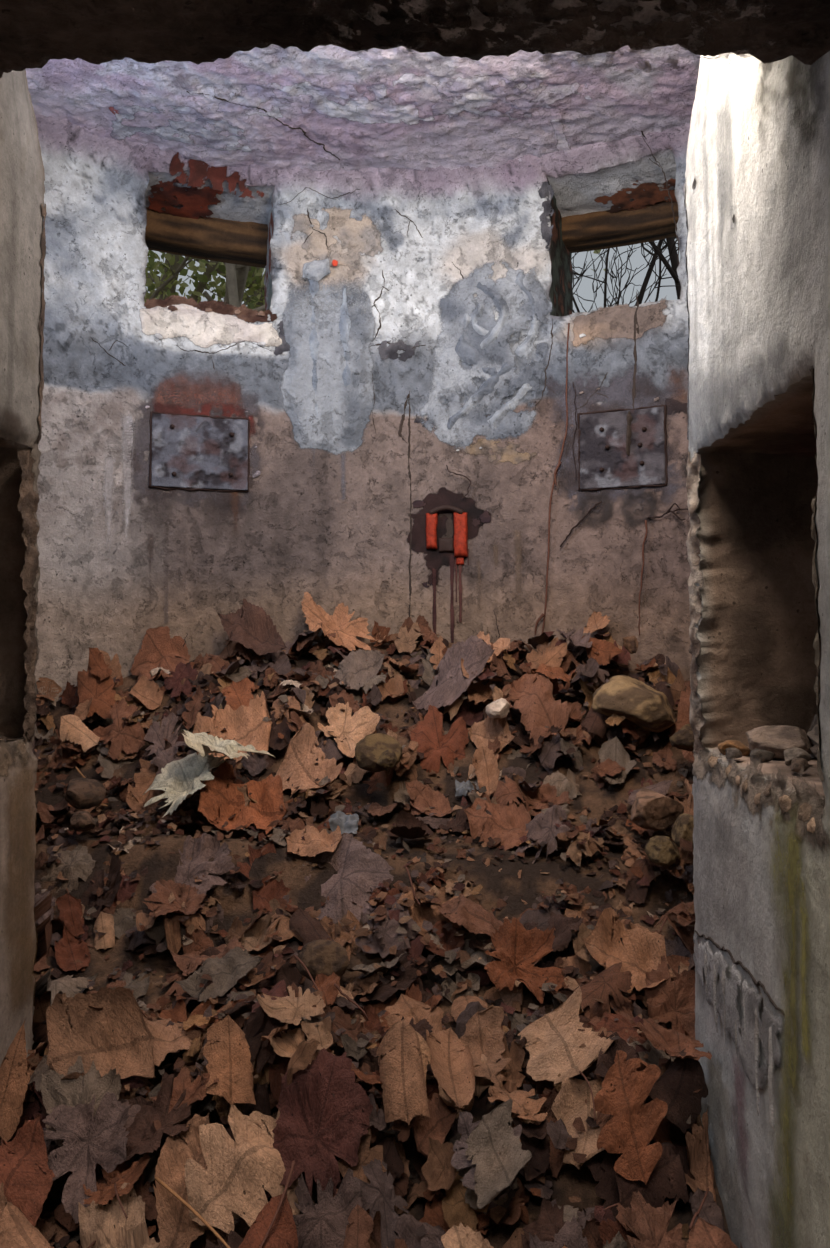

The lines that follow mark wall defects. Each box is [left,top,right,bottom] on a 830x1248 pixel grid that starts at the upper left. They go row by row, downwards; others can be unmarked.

crack [186,91,340,160]
rust [148,152,264,219]
crack [280,187,360,250]
peeling [290,206,383,268]
rust [594,178,677,213]
peeling [139,295,290,356]
spalling [376,340,419,362]
spalling [17,202,47,742]
peeling [128,390,264,512]
peeling [547,178,830,850]
crack [694,930,785,1015]
water stain [784,838,809,1091]